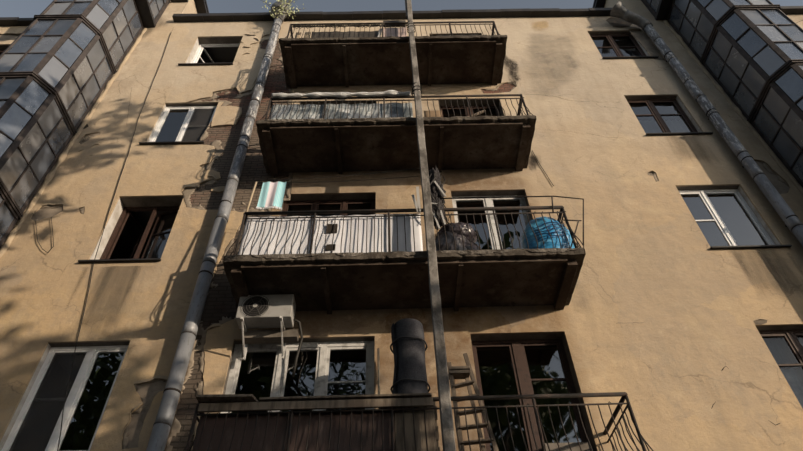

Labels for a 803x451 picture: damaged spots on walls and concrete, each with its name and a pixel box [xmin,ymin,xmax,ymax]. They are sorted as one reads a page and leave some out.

spalling [481,81,517,93]
spalling [31,203,64,221]
spalling [164,34,324,451]
spalling [122,375,168,449]